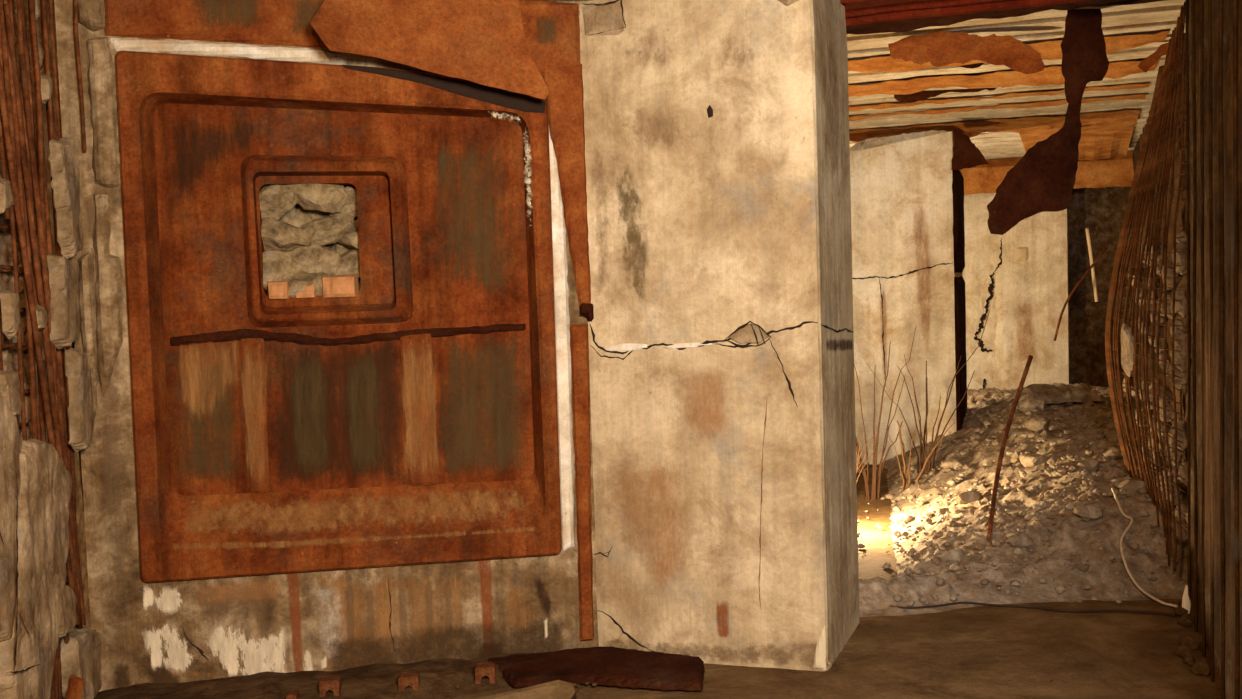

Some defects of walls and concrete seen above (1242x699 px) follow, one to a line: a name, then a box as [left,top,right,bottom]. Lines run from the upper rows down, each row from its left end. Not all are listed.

spalling [0,0,123,699]
corrosion [181,346,264,479]
corrosion [404,351,436,472]
crack [589,262,953,606]
crack [974,238,1002,389]